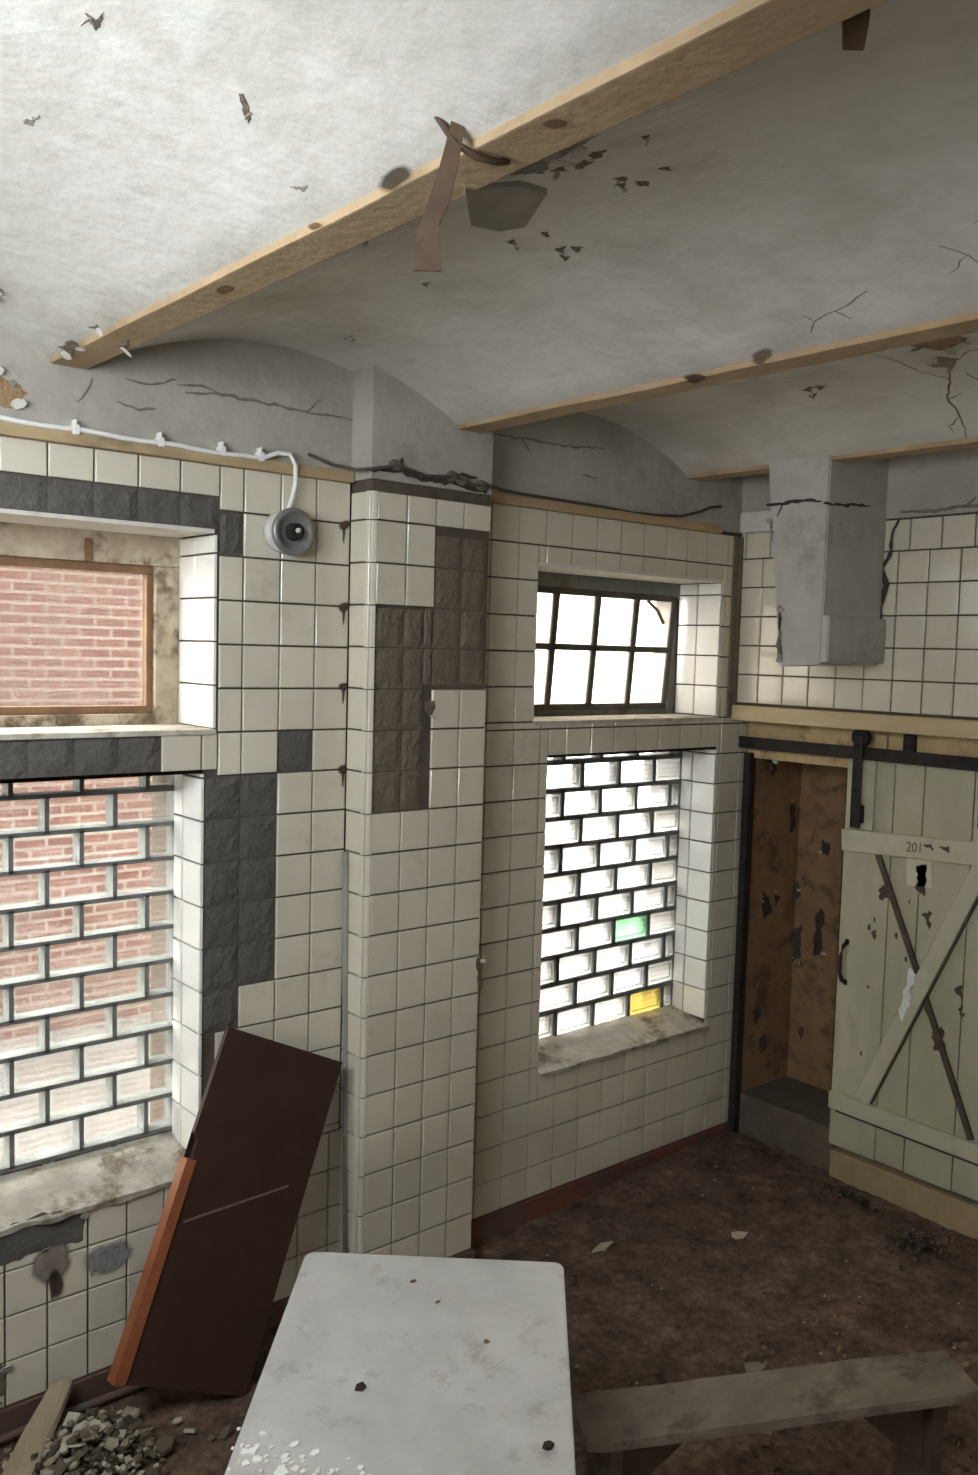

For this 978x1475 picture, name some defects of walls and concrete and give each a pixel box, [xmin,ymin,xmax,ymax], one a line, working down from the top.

flaking render [465,134,607,262]
crack [939,220,978,273]
flaking render [0,366,28,410]
crack [872,349,978,440]
flaking render [909,336,972,373]
crack [766,498,900,619]